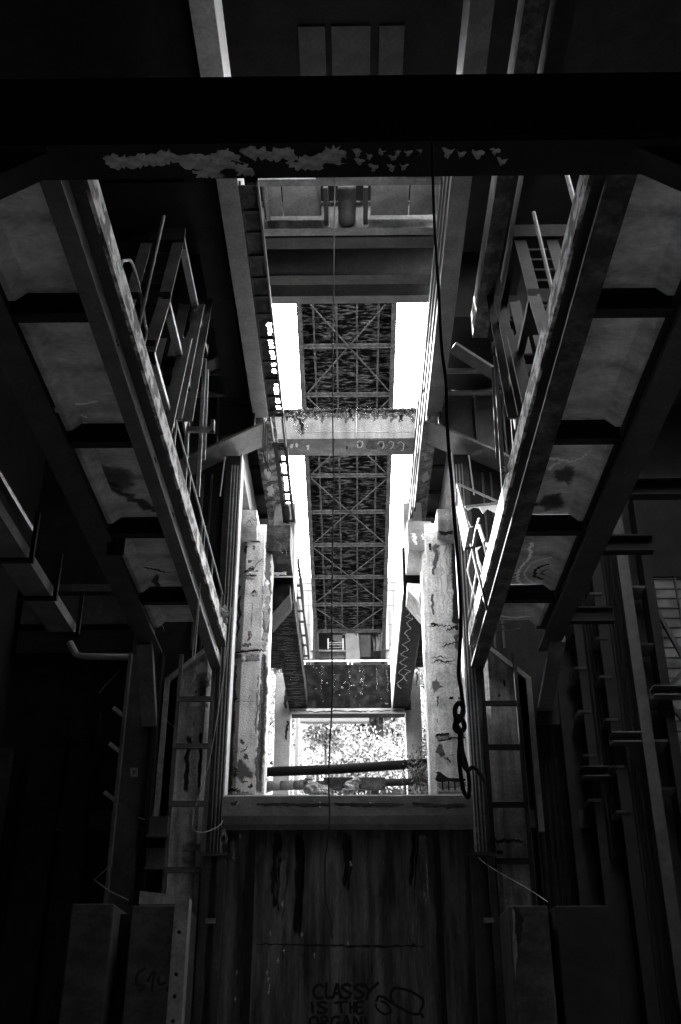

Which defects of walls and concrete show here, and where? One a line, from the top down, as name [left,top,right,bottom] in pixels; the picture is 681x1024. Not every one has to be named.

peeling [103,145,422,180]
peeling [442,147,508,166]
leakage [101,466,155,512]
leakage [532,453,587,515]
crack [428,622,458,665]
leakage [184,733,202,792]
leakage [270,833,282,911]
leakage [293,835,305,937]